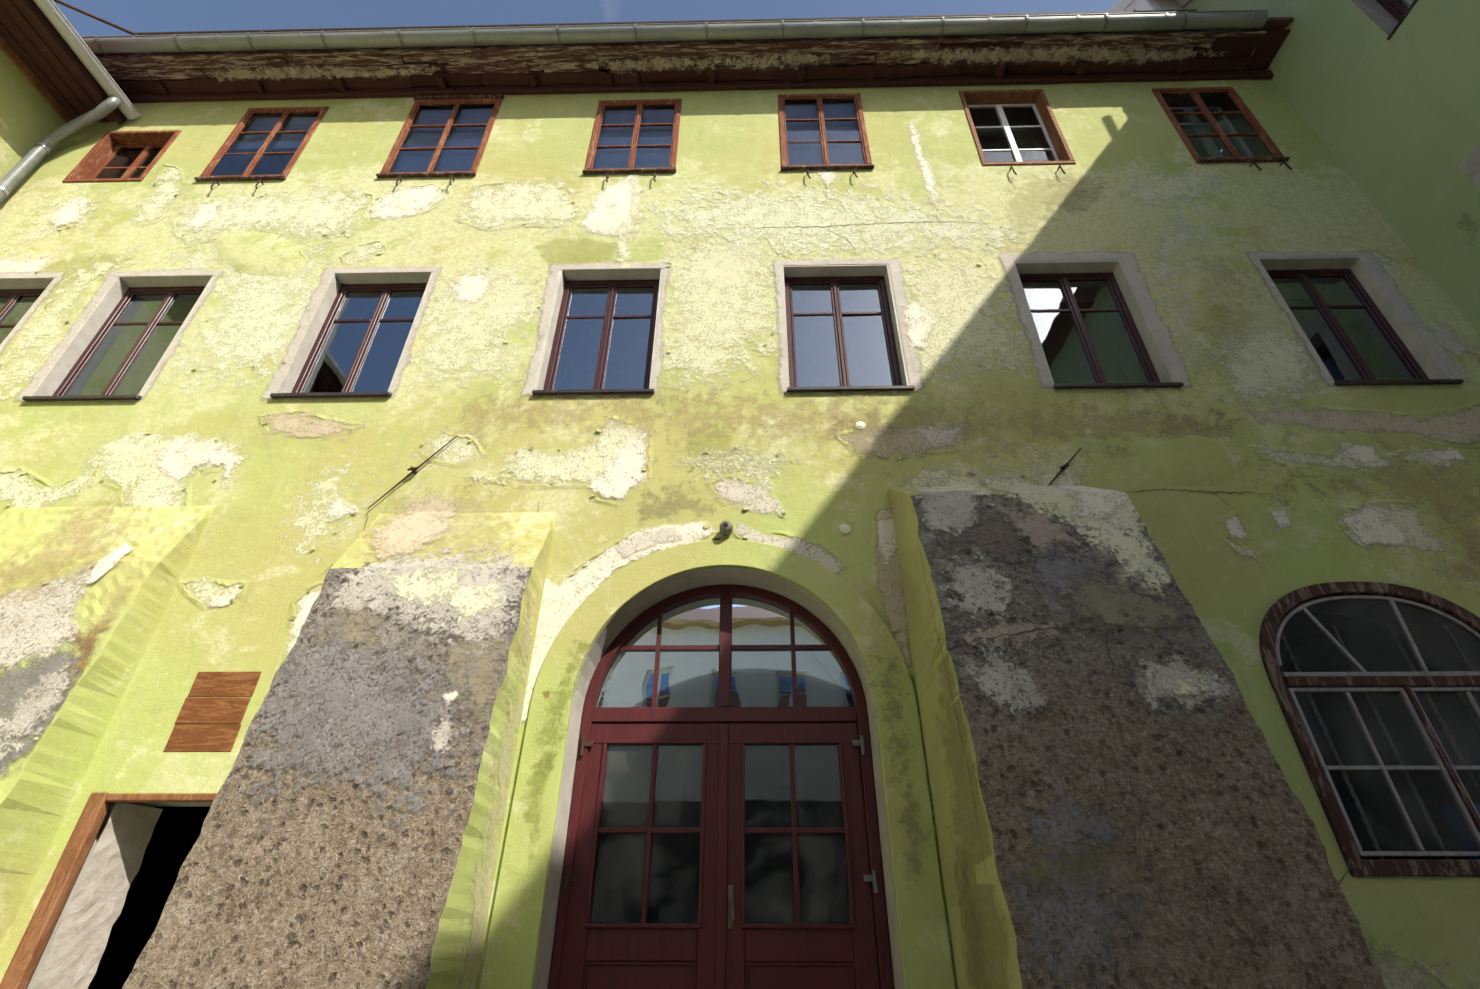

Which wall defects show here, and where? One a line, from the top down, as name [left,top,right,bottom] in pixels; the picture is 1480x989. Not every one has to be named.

peeling [207,64,440,83]
peeling [599,50,837,76]
peeling [879,44,1228,67]
peeling [0,164,581,400]
flaking render [0,430,252,508]
crack [1121,489,1258,508]
flaking render [1242,441,1467,474]
flaking render [1330,499,1449,560]
peeling [833,422,1174,730]
flaking render [0,543,133,780]
spalling [229,409,851,989]
peeling [1135,654,1237,715]